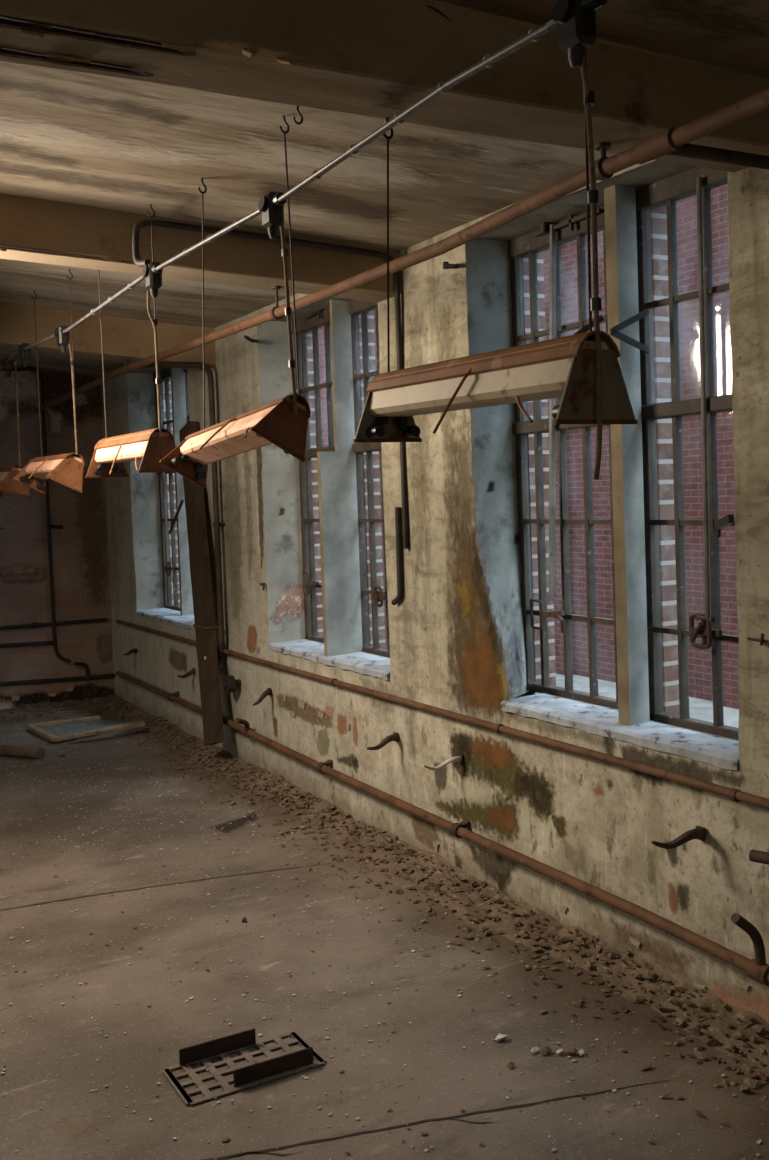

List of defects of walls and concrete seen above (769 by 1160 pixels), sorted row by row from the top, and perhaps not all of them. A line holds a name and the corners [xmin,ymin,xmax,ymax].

spalling [0,47,154,77]
spalling [0,16,297,66]
leakage [0,117,216,161]
leakage [244,136,434,188]
flaking render [0,366,103,435]
flaking render [275,581,304,622]
corrosion [448,529,512,716]
leakage [435,734,566,841]
leakage [455,850,516,891]
flaking render [614,924,691,971]
flaking render [695,980,769,1023]